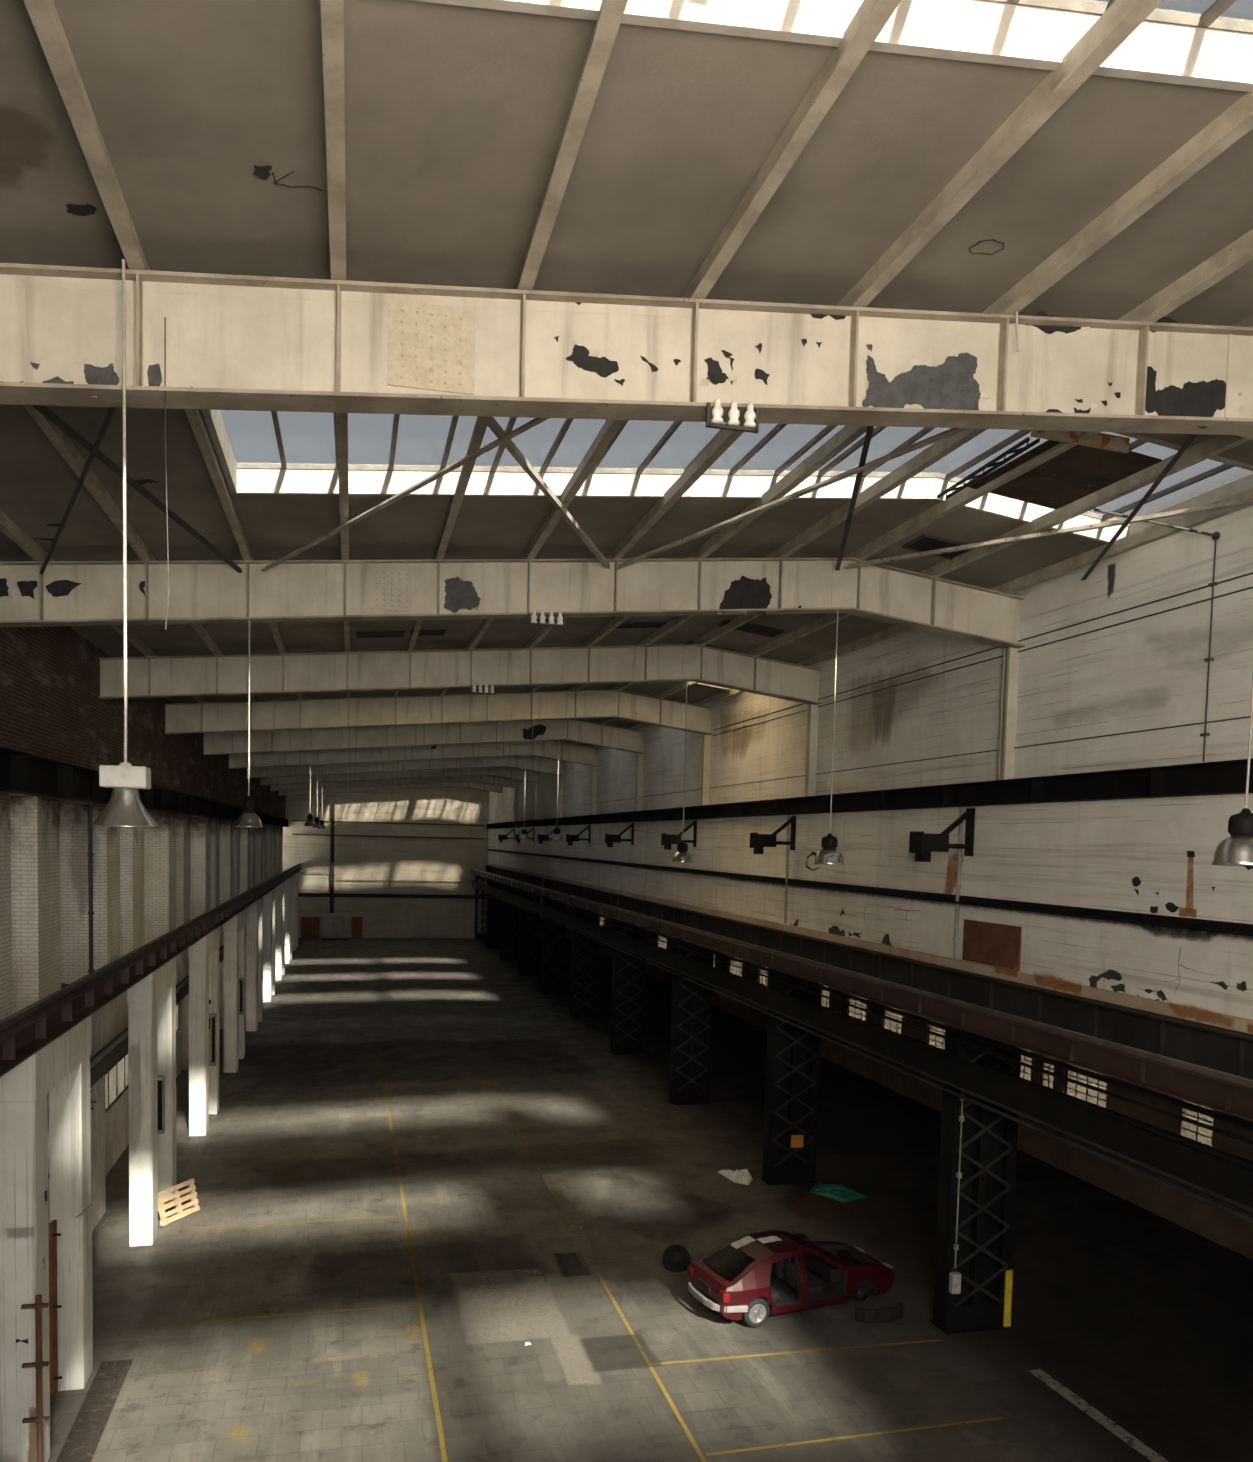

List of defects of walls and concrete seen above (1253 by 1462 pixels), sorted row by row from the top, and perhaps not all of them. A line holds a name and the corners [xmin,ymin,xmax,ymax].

peeling [553,336,625,387]
peeling [640,355,681,372]
peeling [699,343,770,386]
peeling [857,344,990,410]
peeling [1145,362,1245,429]
peeling [0,578,88,600]
peeling [444,576,485,613]
peeling [718,576,772,615]
corrosion [1179,851,1196,917]
peeling [1089,969,1169,1001]